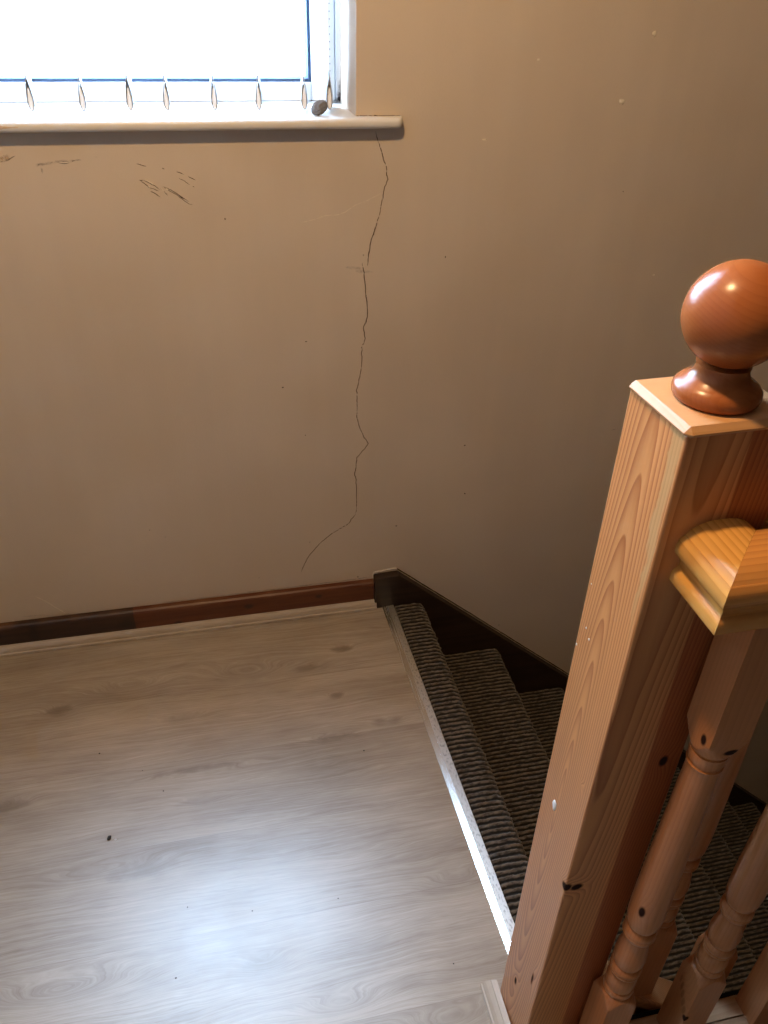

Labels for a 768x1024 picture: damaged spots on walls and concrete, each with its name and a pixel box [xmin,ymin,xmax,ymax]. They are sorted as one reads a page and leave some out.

crack [302,115,400,569]